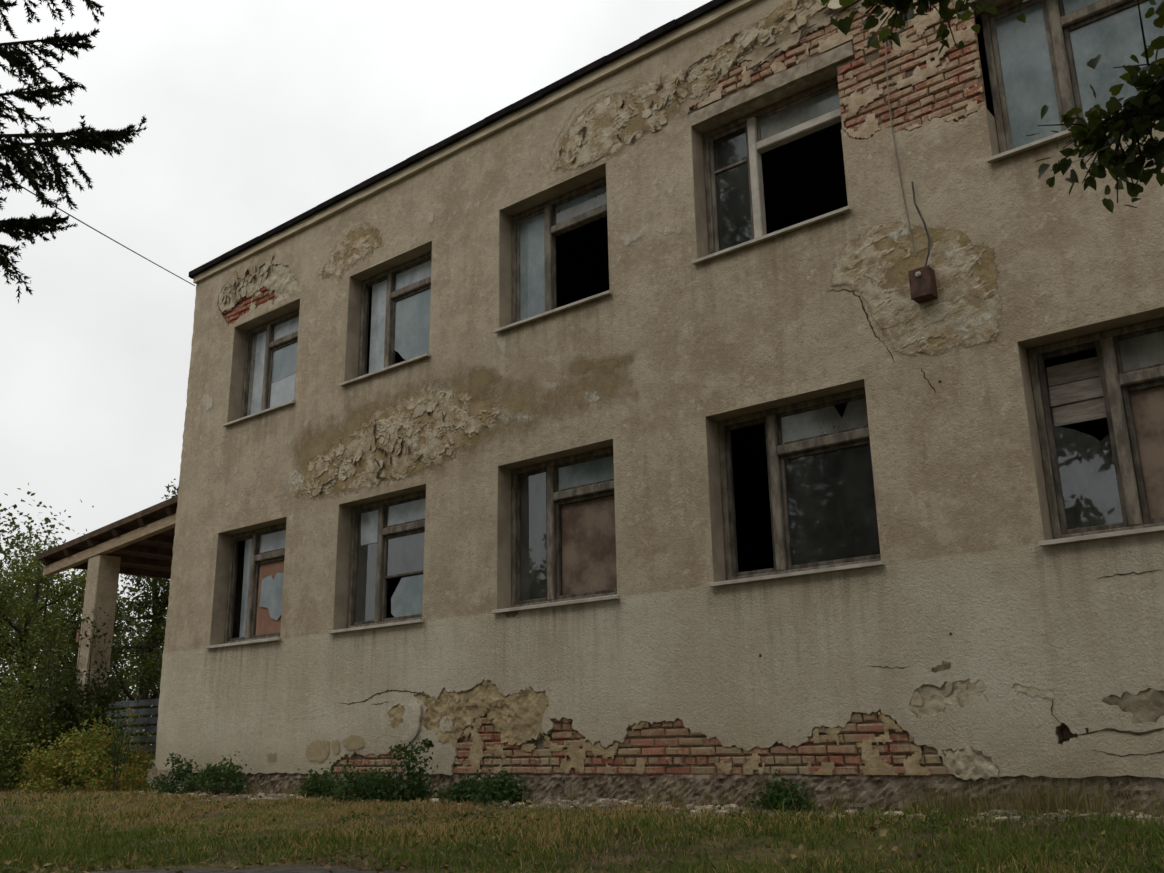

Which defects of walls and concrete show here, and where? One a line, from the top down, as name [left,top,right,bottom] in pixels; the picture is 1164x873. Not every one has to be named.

flaking render [551,0,987,173]
flaking render [219,253,297,326]
flaking render [830,219,1003,361]
flaking render [294,382,503,500]
flaking render [305,734,409,773]
flaking render [388,704,405,729]
flaking render [415,680,999,783]
flaking render [909,661,989,719]
crack [1051,700,1164,757]
flaking render [1102,688,1164,723]